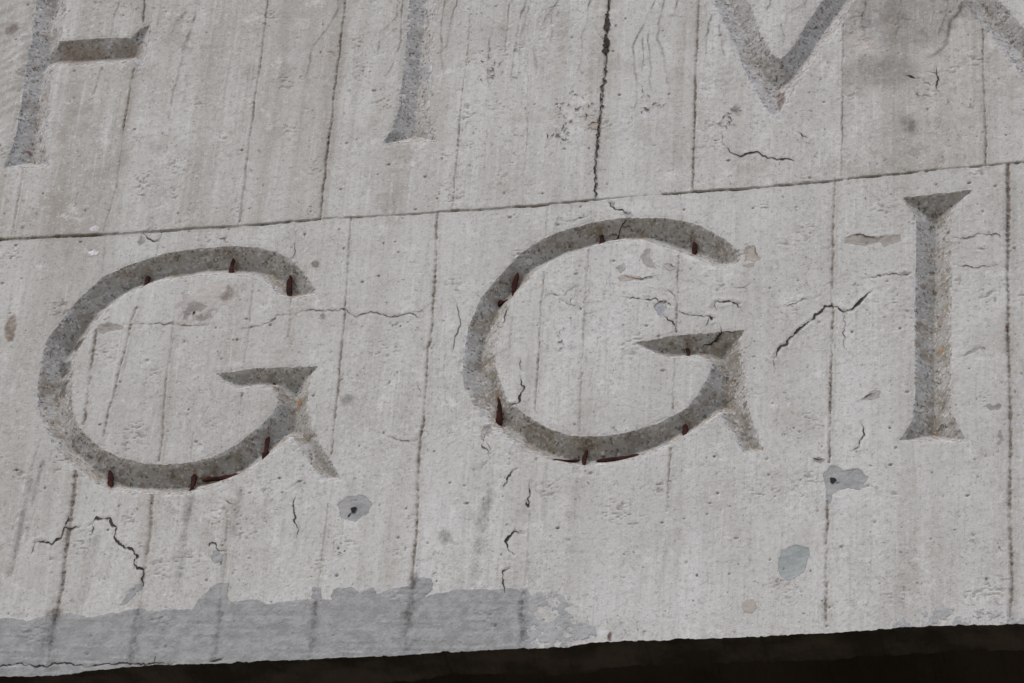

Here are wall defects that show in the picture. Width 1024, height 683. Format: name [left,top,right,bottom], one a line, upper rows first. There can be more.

crack [722,138,792,160]
rust [498,272,519,307]
crack [773,273,908,368]
rust [495,397,503,426]
rust [552,450,639,465]
rust [189,473,238,491]
crack [31,515,144,583]